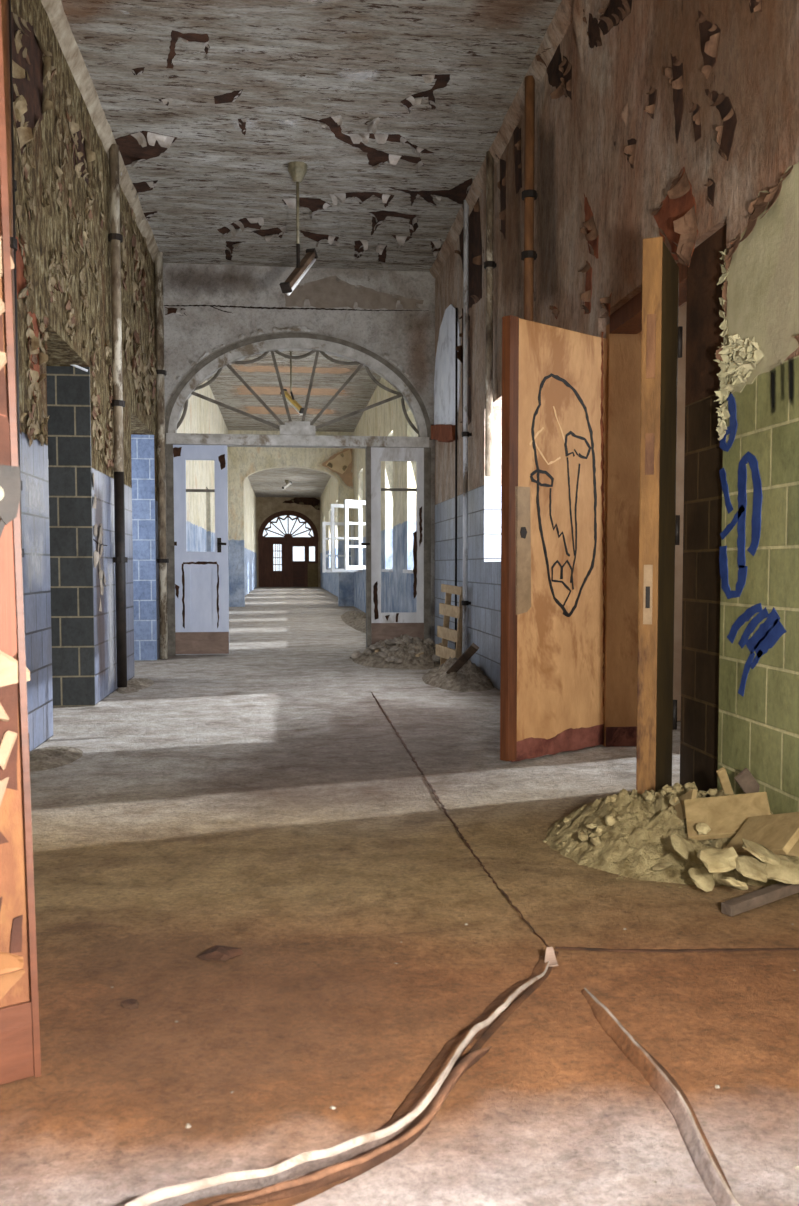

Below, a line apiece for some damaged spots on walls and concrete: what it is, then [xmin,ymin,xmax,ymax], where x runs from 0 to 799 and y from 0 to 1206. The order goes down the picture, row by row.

peeling [166,30,210,69]
peeling [214,89,243,104]
peeling [401,74,450,113]
peeling [536,44,572,100]
peeling [583,0,632,48]
peeling [644,11,737,161]
peeling [578,194,611,317]
peeling [652,167,715,267]
peeling [714,162,799,441]
peeling [0,650,30,805]
peeling [0,897,25,1000]
crack [116,692,799,1206]